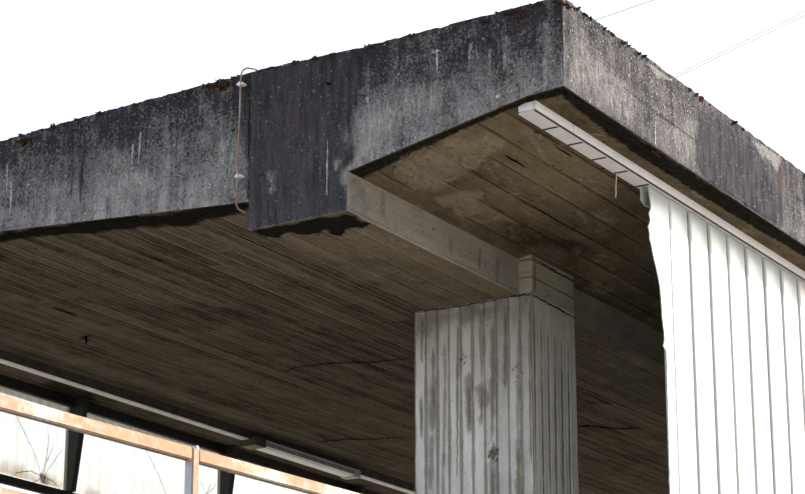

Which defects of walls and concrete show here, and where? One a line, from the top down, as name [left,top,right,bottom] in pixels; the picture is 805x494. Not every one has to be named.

damp [70,142,85,202]
damp [242,53,436,230]
damp [697,117,783,224]
crack [14,417,62,487]
crack [286,358,411,372]
damp [419,349,446,494]
damp [456,306,496,430]
damp [541,332,571,494]